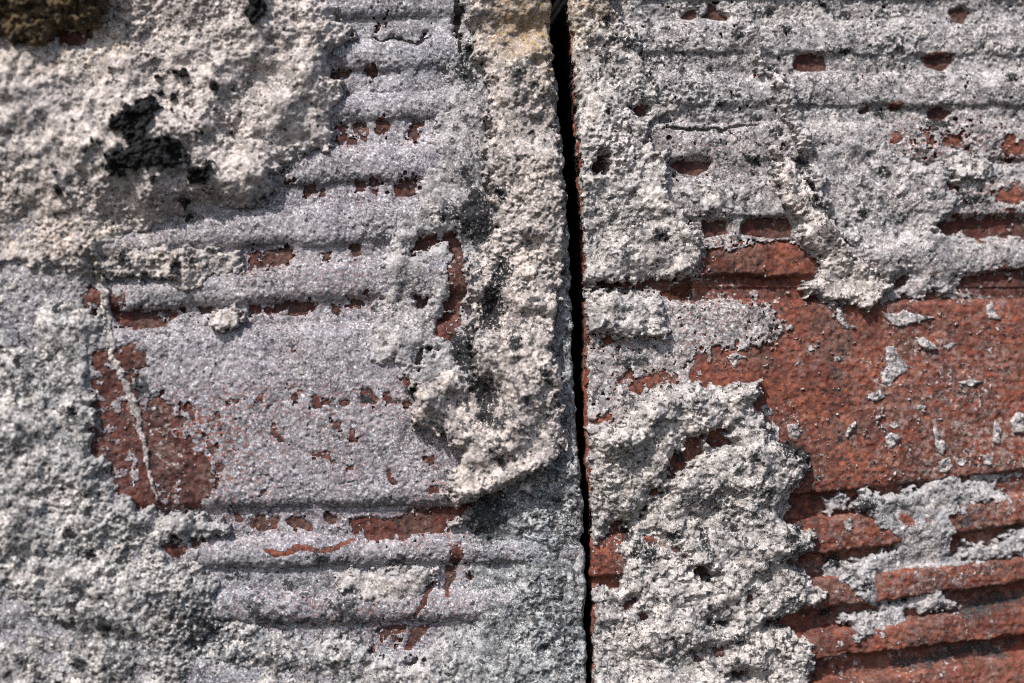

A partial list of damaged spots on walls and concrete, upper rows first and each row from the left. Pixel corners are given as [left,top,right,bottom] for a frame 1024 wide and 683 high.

crack [573,115,582,168]
peeling [936,182,1024,241]
peeling [249,299,316,318]
peeling [410,231,467,341]
crack [583,332,591,386]
peeling [81,288,225,512]
peeling [598,218,1024,683]
peeling [228,509,313,532]
peeling [324,503,469,543]
peeling [445,542,473,598]
peeling [590,520,628,589]
crack [589,612,597,670]